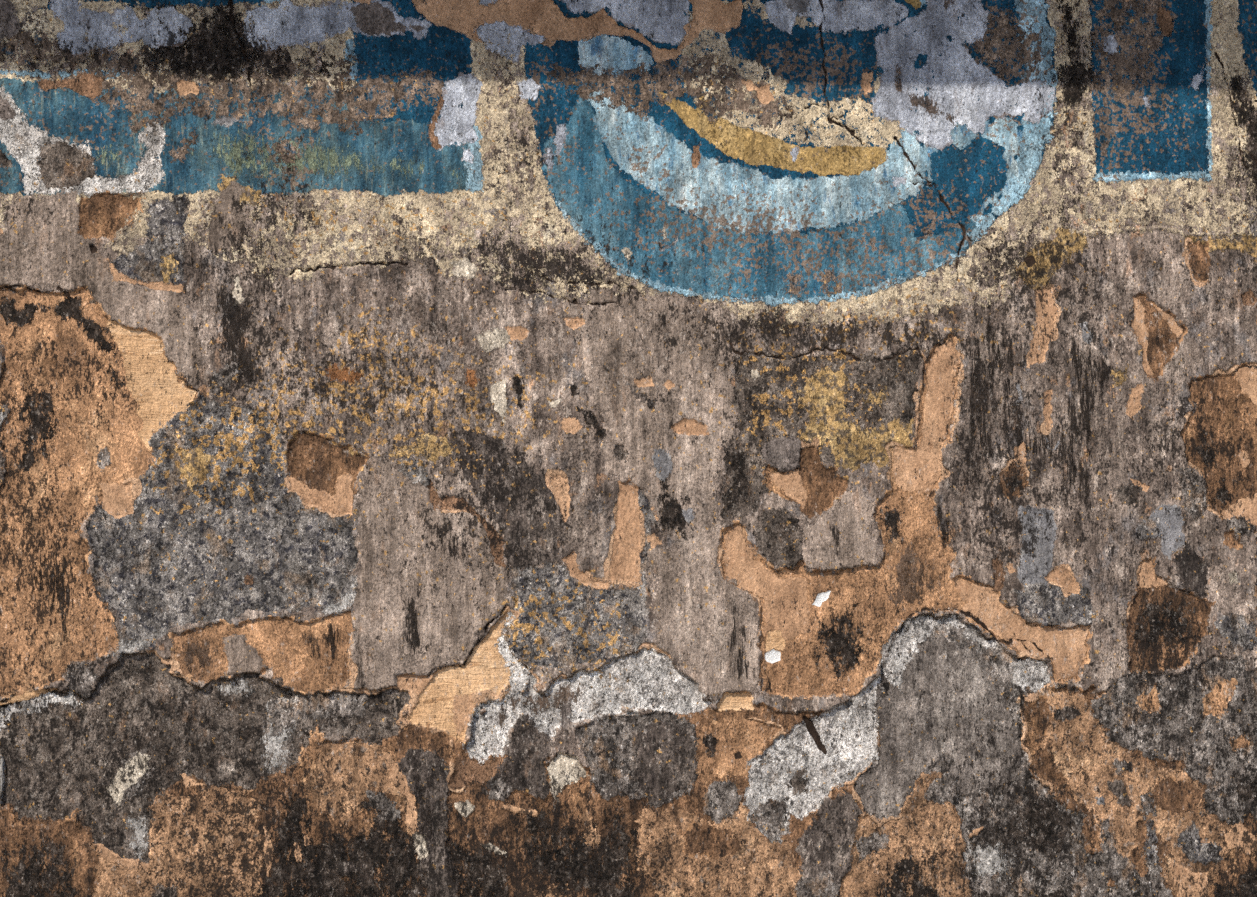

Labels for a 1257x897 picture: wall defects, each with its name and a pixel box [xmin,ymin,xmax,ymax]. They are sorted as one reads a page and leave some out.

damp [0,1,449,137]
peeling [412,0,743,63]
crack [799,0,864,146]
damp [1228,64,1257,200]
crack [894,136,991,281]
spalling [1110,291,1188,420]
spalling [671,418,710,436]
spalling [1177,362,1257,550]
spalling [0,284,538,877]
flaking render [677,328,1224,897]
spalling [547,751,601,850]
spalling [152,883,178,897]